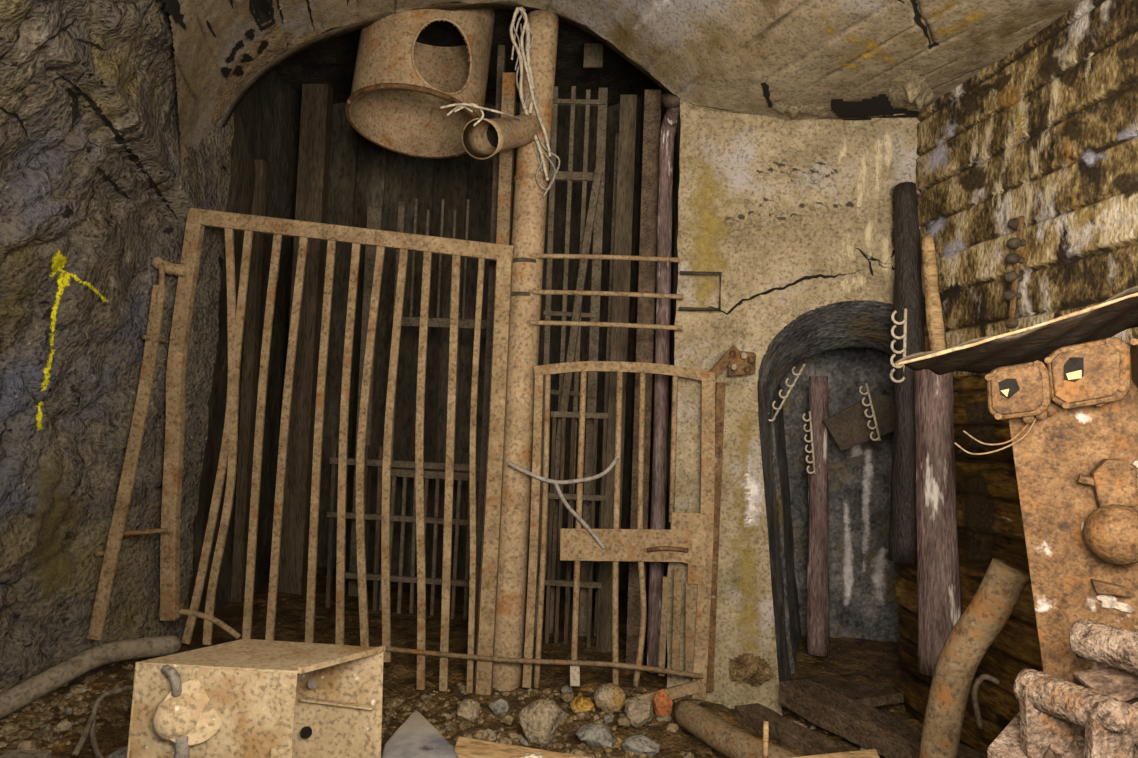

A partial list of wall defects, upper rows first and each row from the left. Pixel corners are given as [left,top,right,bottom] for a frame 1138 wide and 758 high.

crack [898,0,939,49]
spalling [212,0,324,126]
spalling [772,70,937,120]
crack [708,247,895,315]